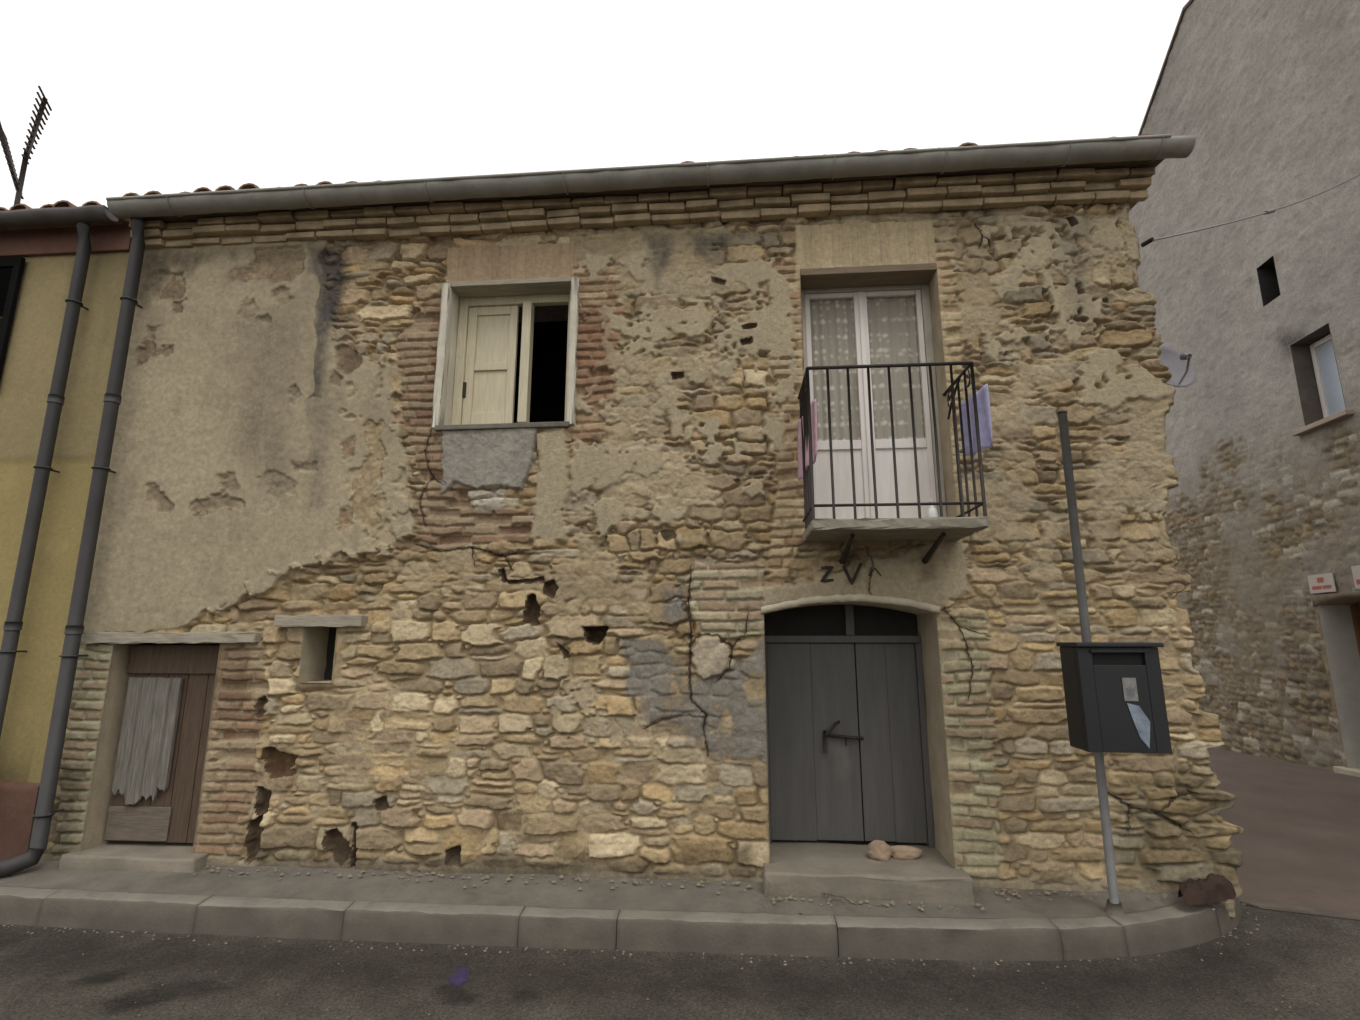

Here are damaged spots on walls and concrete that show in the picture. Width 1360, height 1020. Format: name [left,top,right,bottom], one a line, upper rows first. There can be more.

spalling [331,328,397,386]
peeling [337,419,419,559]
peeling [267,548,360,576]
spalling [498,566,545,584]
spalling [254,696,268,719]
spalling [244,786,272,865]
spalling [348,822,359,868]